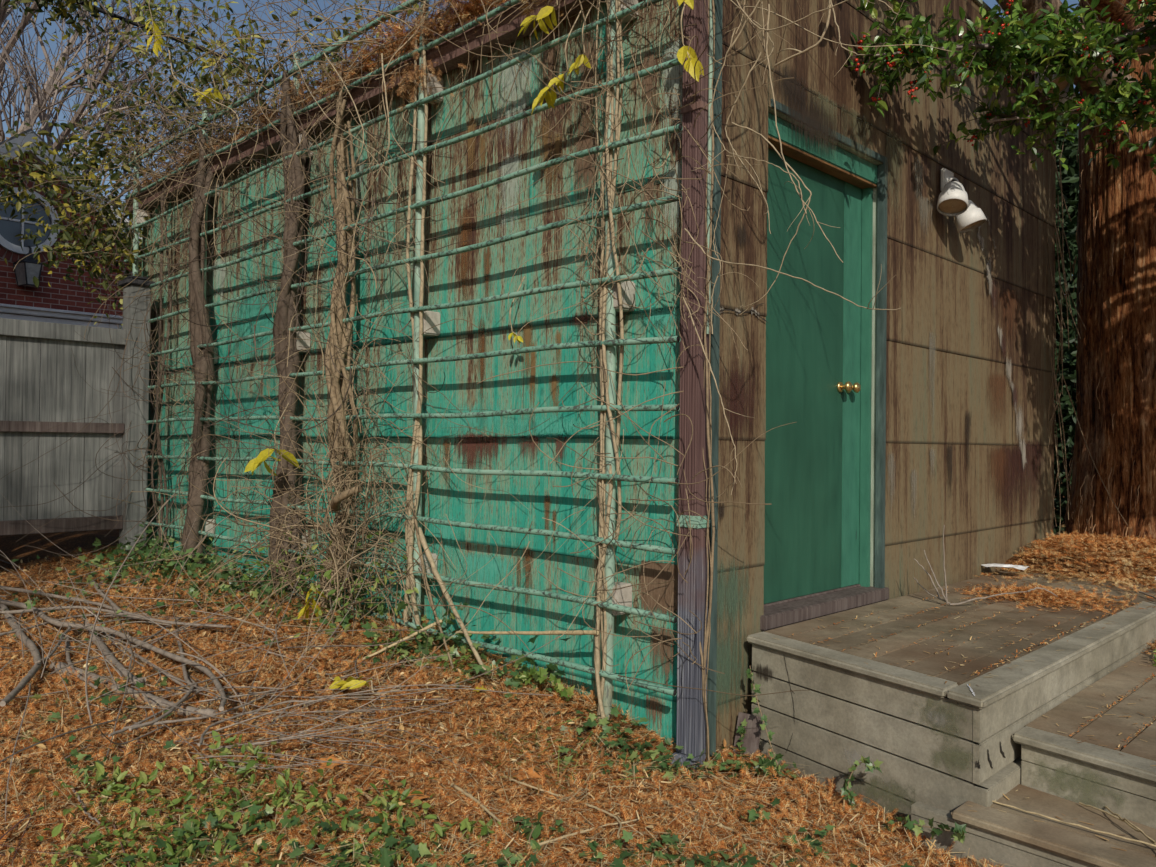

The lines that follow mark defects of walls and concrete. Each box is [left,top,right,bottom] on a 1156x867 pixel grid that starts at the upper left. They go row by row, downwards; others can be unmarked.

corrosion [544,497,556,544]
corrosion [517,547,532,603]